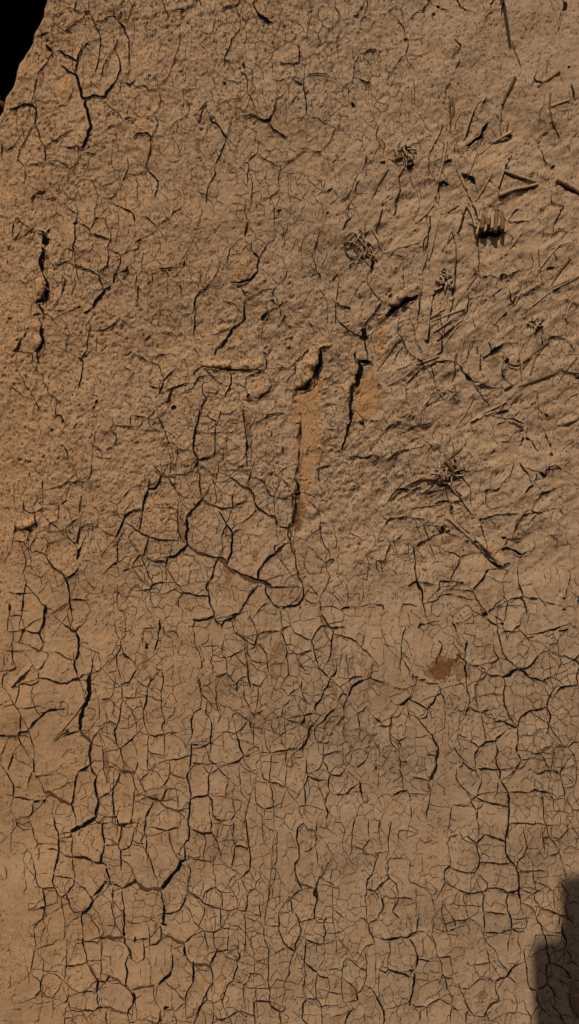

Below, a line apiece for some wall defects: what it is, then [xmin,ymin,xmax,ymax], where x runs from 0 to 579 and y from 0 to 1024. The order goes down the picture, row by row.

crack [1,0,192,429]
crack [162,0,273,65]
crack [192,71,302,218]
crack [230,43,380,223]
crack [353,0,504,79]
crack [300,81,578,478]
crack [478,40,550,84]
crack [0,206,579,1024]